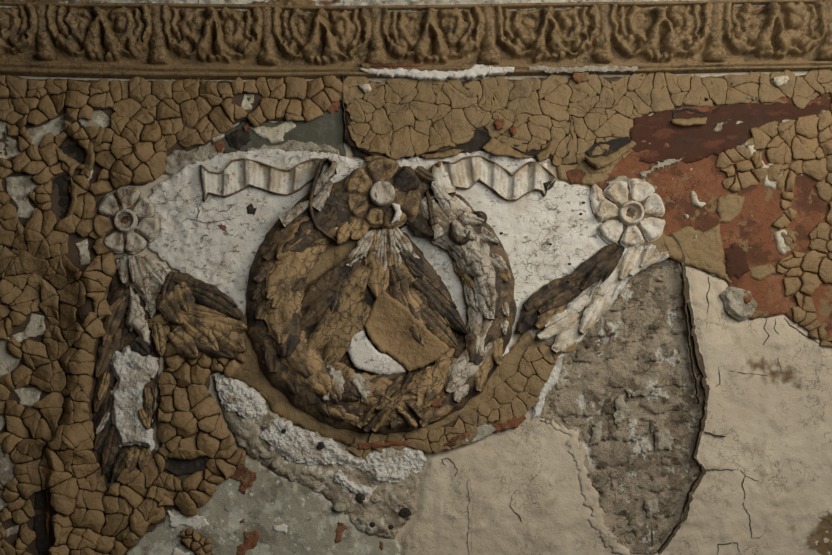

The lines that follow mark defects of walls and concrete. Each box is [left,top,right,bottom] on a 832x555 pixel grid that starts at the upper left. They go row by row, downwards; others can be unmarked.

peeling [0,110,111,218]
crack [0,75,348,555]
spalling [126,369,429,555]
flaking render [147,99,554,335]
flaking render [348,331,408,399]
peeling [358,64,515,93]
crack [346,342,577,473]
flaking render [455,179,609,356]
crack [342,69,832,174]
flaking render [531,252,704,555]
crack [658,233,782,555]
crack [715,104,832,347]